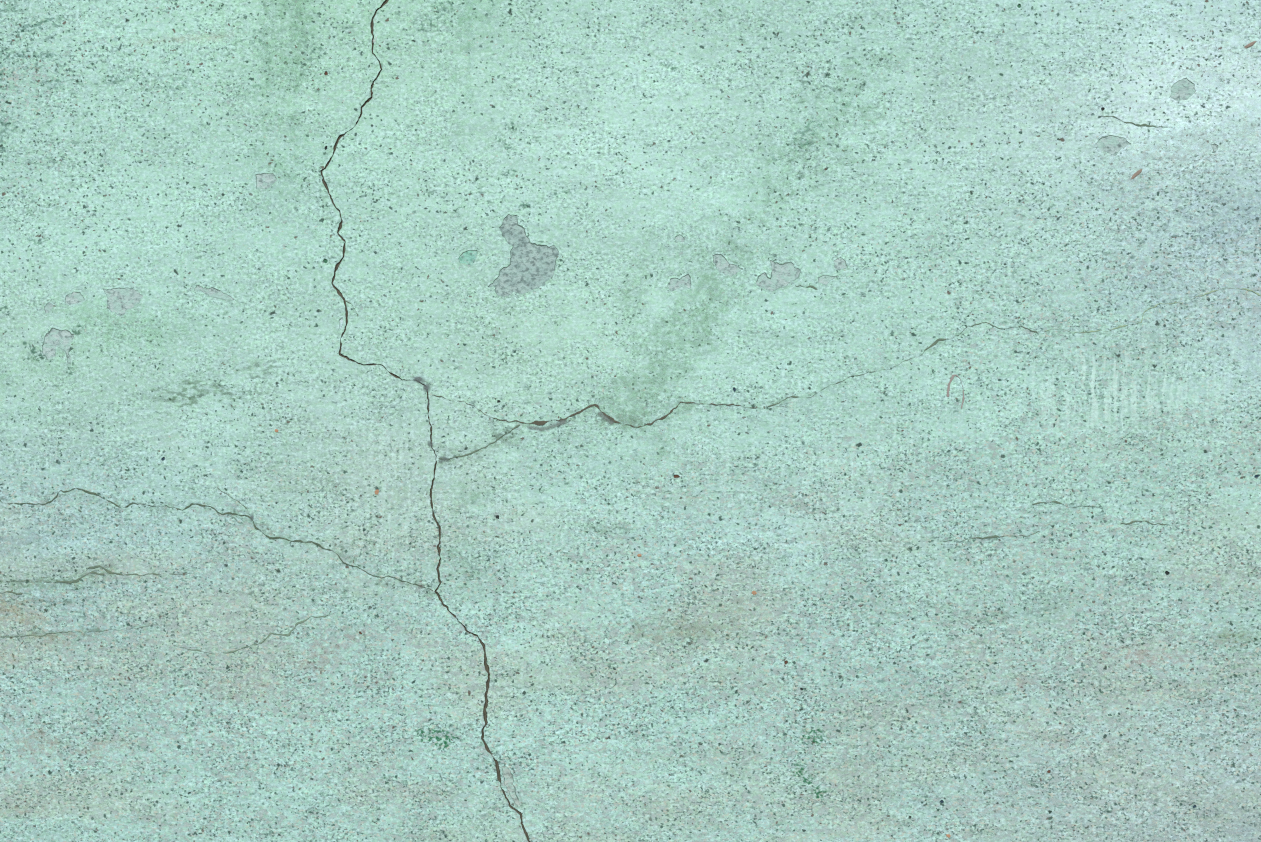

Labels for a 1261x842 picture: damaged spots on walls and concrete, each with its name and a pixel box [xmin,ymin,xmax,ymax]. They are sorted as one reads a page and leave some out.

peeling [485,212,562,300]
crack [161,0,1127,842]
crack [0,488,151,508]
crack [4,565,186,595]
crack [3,612,335,654]